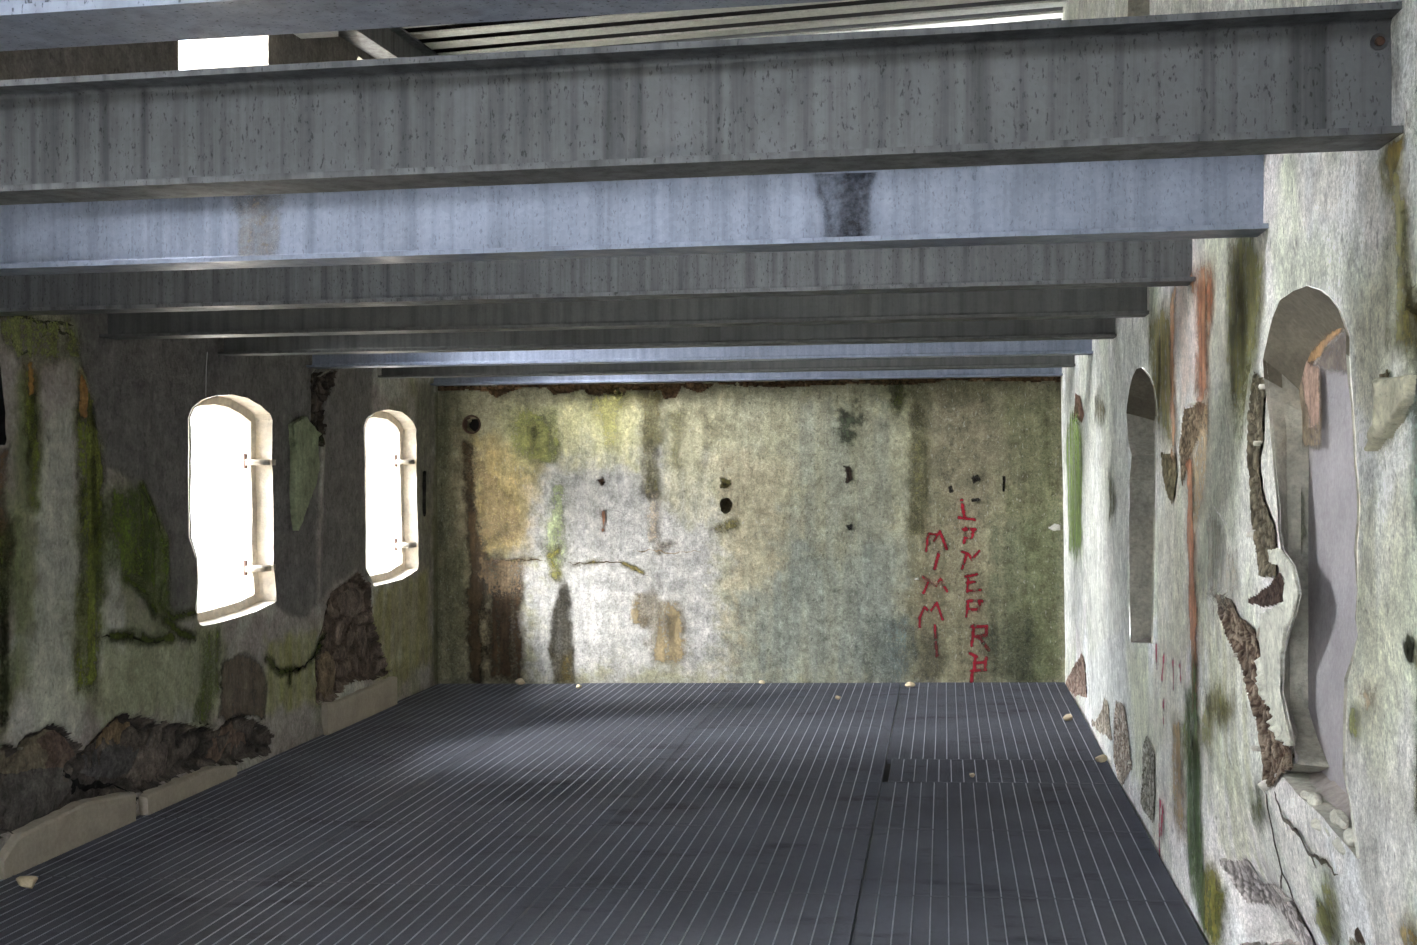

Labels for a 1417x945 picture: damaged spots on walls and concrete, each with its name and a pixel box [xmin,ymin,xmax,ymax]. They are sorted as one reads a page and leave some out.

damp [0,448,14,563]
damp [461,440,524,684]
spalling [1161,402,1208,504]
rust [1170,266,1212,706]
damp [547,581,574,684]
spalling [0,713,274,839]